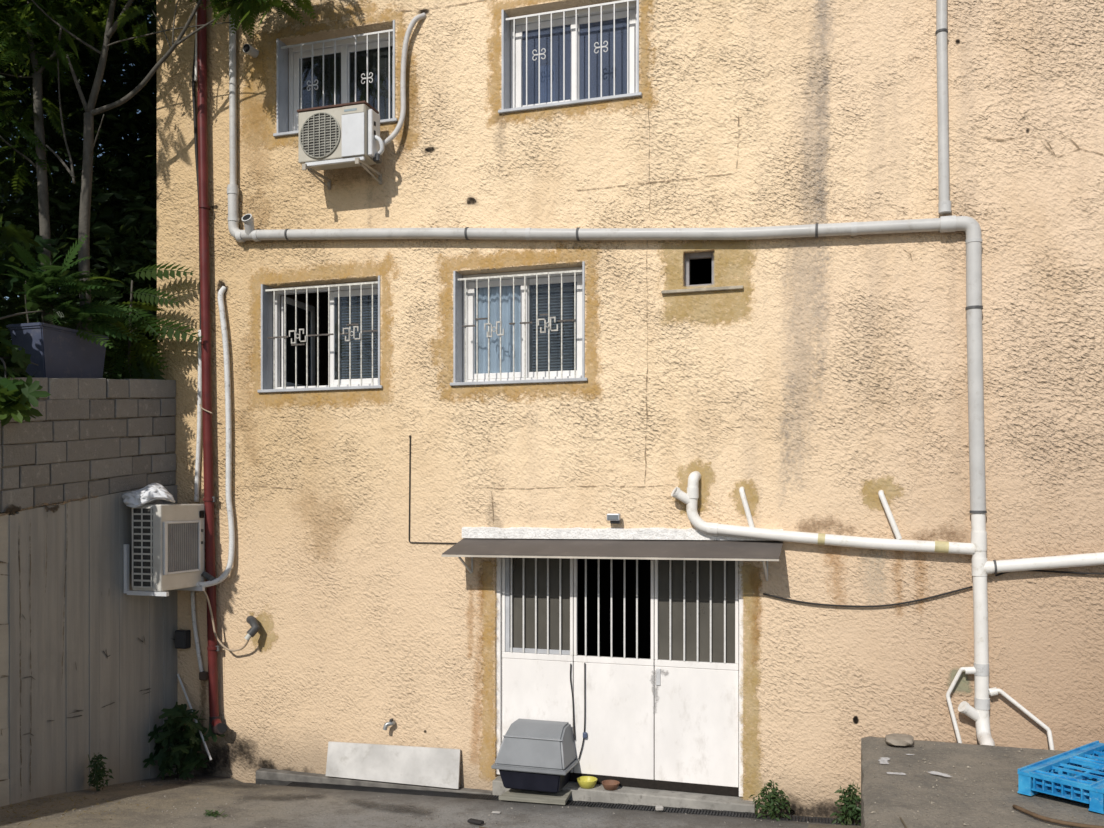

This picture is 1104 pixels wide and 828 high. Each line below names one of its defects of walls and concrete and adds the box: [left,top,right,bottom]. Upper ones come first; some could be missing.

crack [984,135,1103,158]
water stain [179,740,318,800]